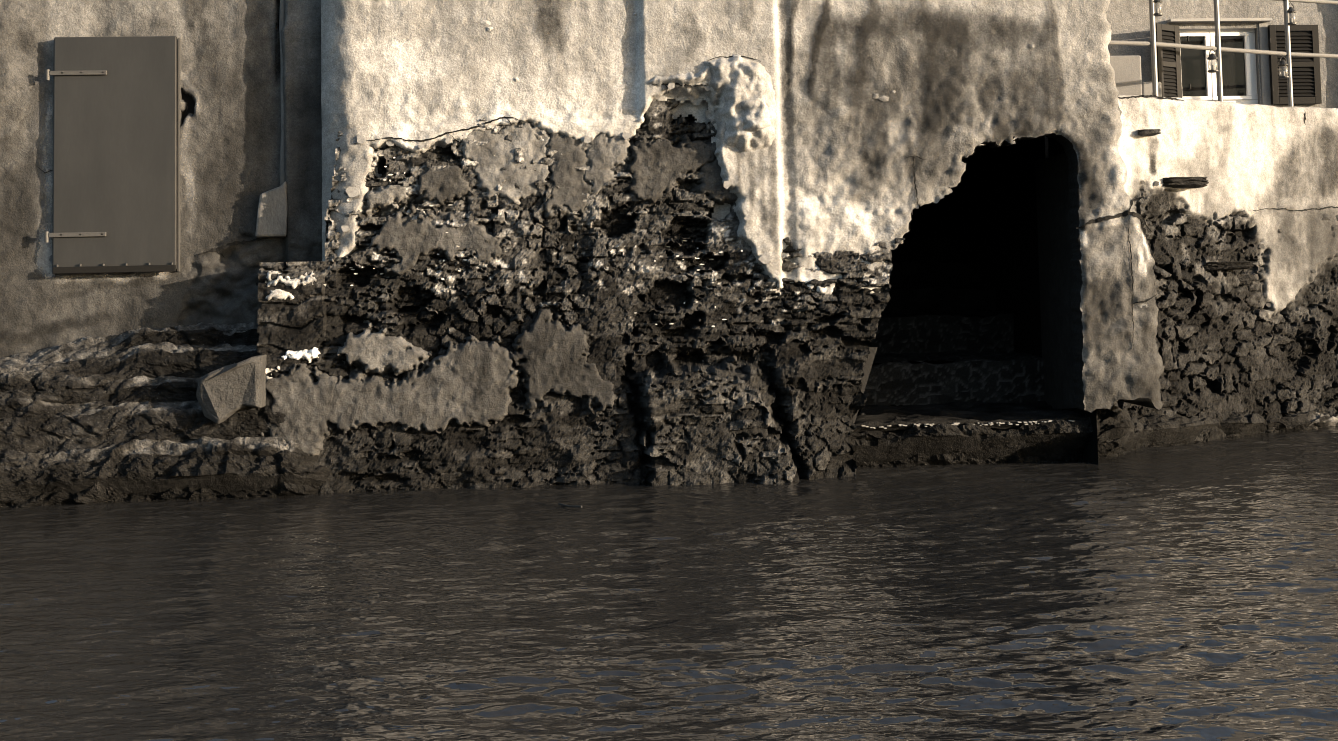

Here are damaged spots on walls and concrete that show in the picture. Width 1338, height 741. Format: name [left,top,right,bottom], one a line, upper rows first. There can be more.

damp [545,0,563,44]
damp [785,0,799,88]
damp [808,0,1030,178]
spalling [261,82,905,456]
spalling [1135,180,1338,383]
crack [1253,205,1338,213]